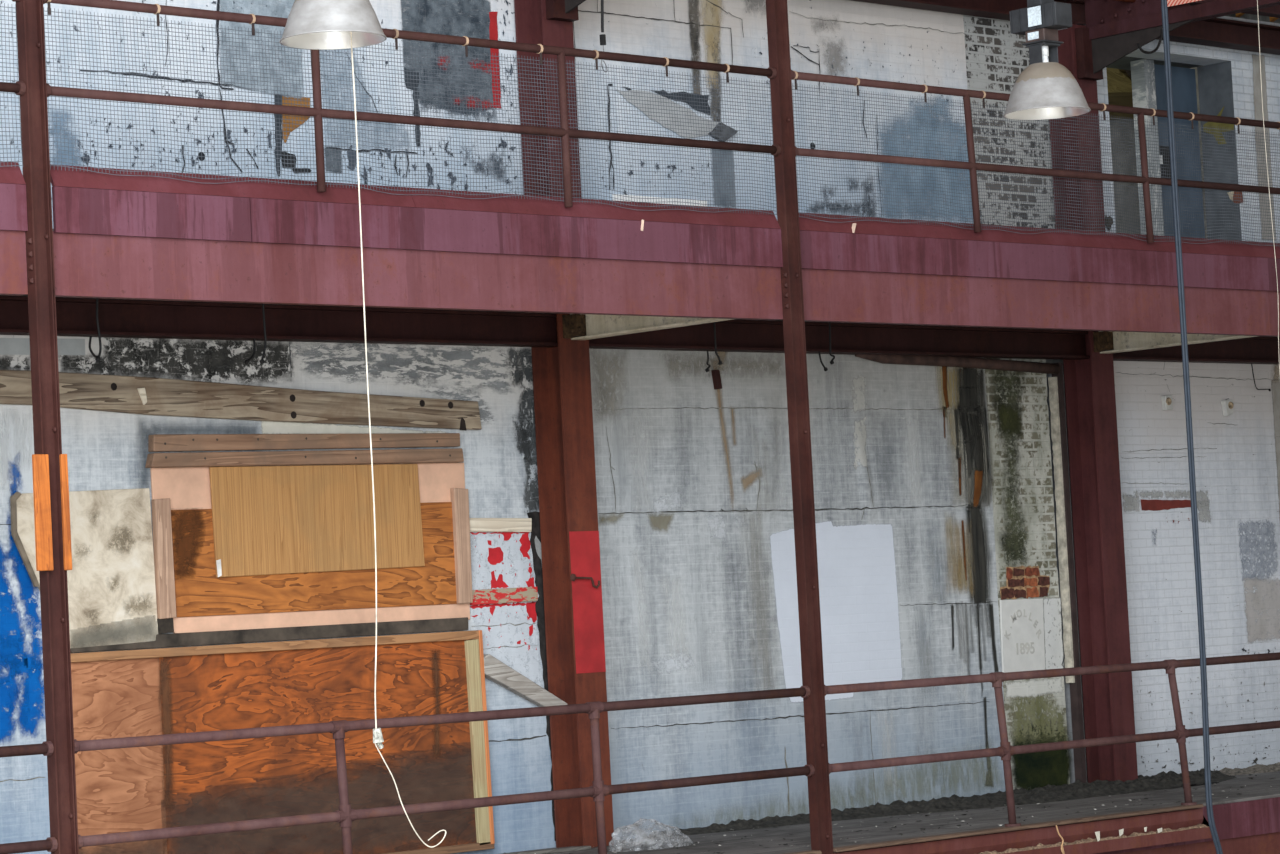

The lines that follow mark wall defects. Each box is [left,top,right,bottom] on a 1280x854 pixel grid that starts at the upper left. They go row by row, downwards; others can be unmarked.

peeling [0,356,30,370]
corrosion [942,366,961,438]
flaking render [61,337,548,691]
damp [939,368,998,787]
spalling [1000,565,1062,697]
flaking render [546,716,556,841]